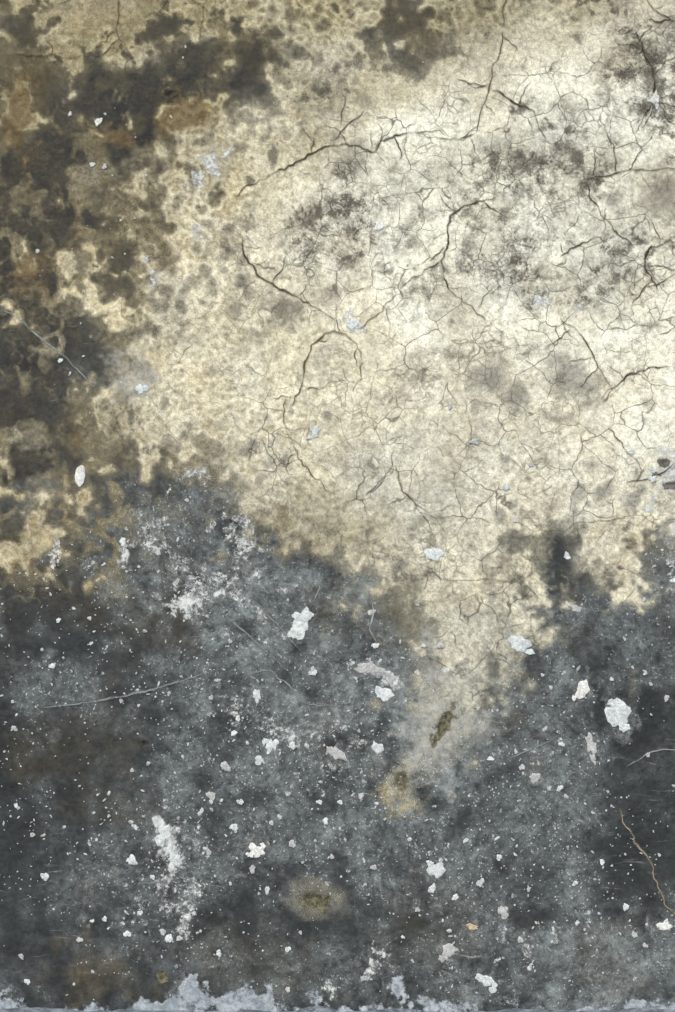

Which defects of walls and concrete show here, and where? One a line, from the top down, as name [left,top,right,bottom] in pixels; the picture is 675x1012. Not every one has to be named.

crack [237,1,545,196]
crack [585,7,675,206]
crack [242,239,314,307]
damp [0,0,675,772]
crack [275,198,501,421]
crack [552,321,663,400]
crack [561,224,674,300]
crack [286,447,327,491]
damp [152,806,210,937]
damp [361,947,389,980]